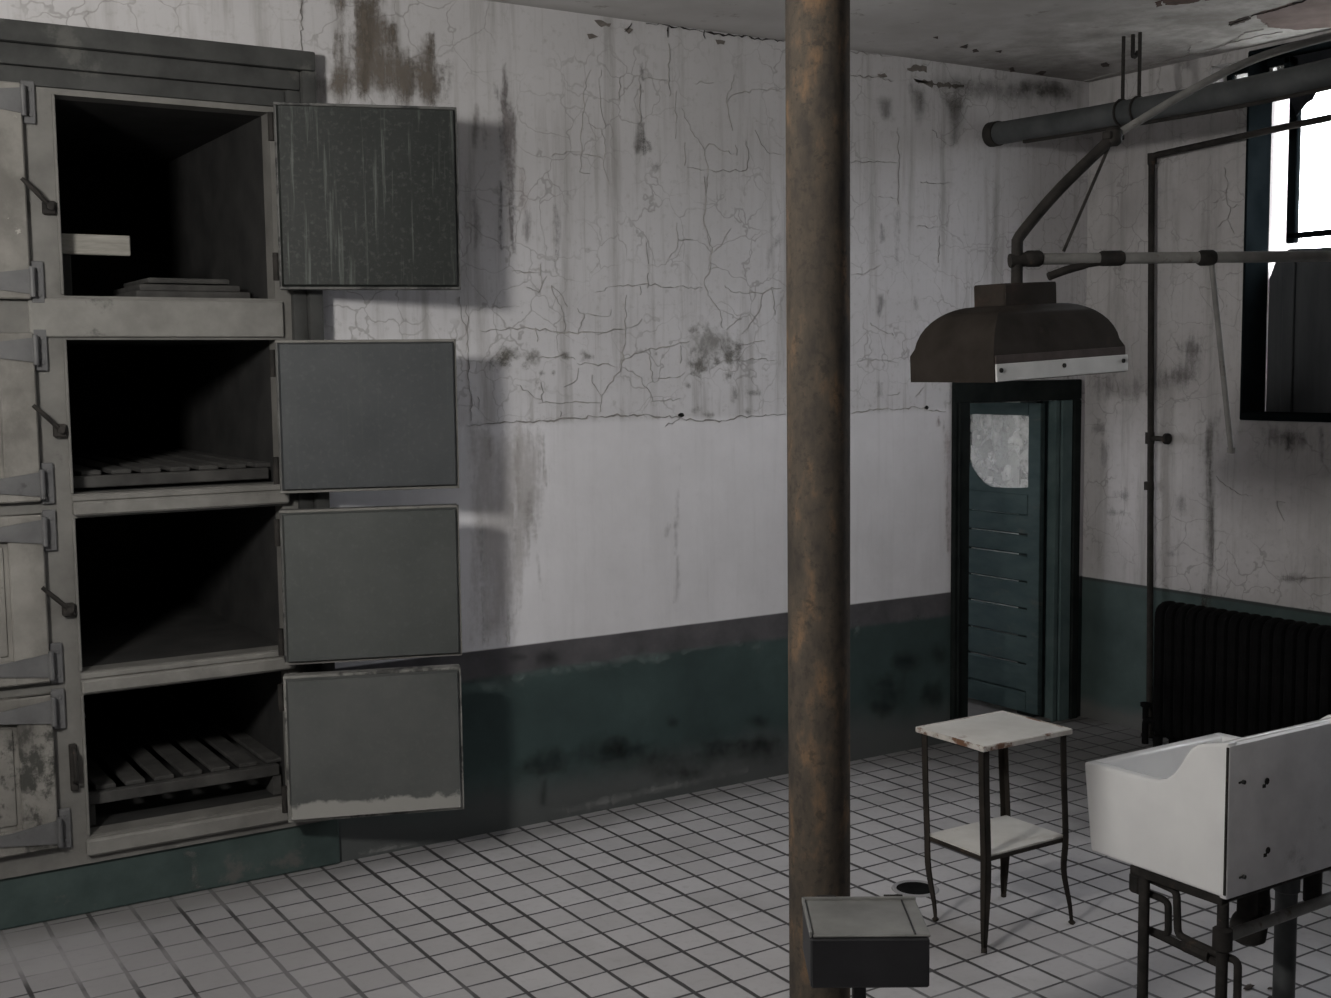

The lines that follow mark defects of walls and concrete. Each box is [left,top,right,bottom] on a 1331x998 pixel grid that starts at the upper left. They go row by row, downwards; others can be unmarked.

water stain [330,0,436,102]
flaking render [1229,0,1331,30]
water stain [500,74,528,240]
crack [459,23,784,427]
crack [851,128,950,263]
crack [850,324,945,414]